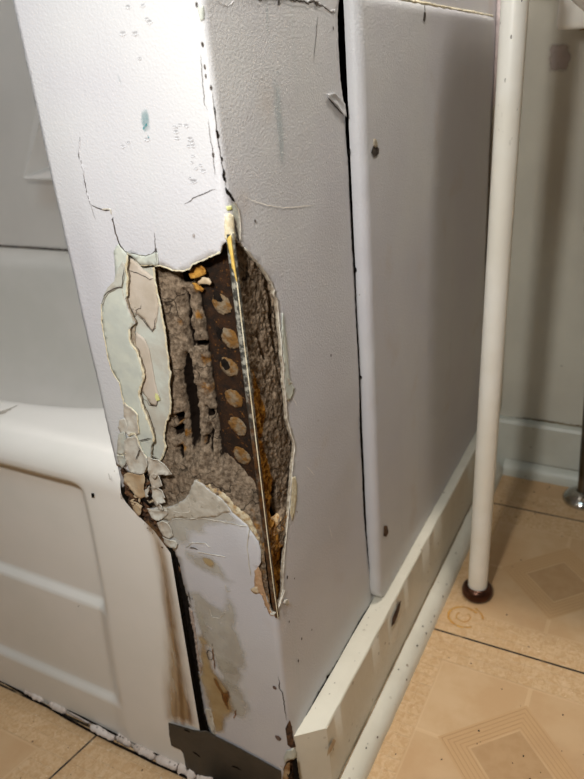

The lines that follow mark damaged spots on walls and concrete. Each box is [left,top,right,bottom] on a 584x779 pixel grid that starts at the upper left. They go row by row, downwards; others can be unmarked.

crack [291,0,336,62]
crack [78,140,125,251]
spalling [101,202,298,618]
damp [199,636,236,731]
peeling [193,595,245,715]
peeling [284,721,297,763]